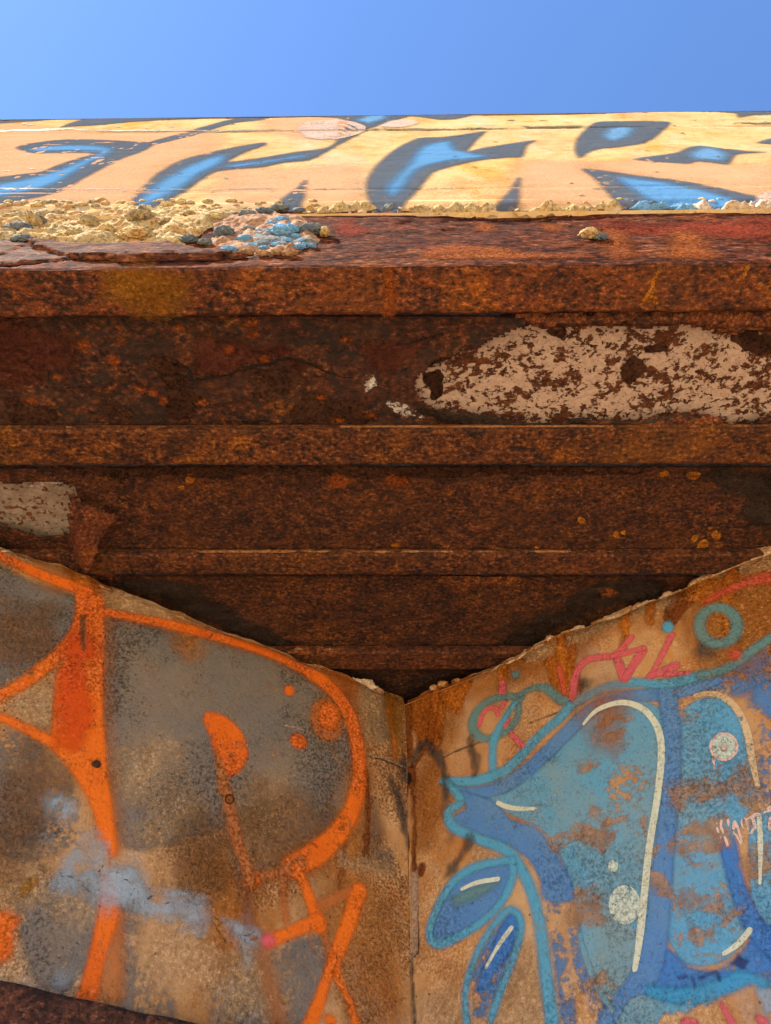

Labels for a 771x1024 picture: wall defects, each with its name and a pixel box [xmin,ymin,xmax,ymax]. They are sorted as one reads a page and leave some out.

peeling [0,238,275,266]
rust [421,245,592,259]
rust [593,217,771,259]
rust [515,270,771,335]
spalling [414,312,771,427]
spalling [0,482,77,537]
rust [66,493,120,610]
spalling [76,574,225,635]
spalling [480,546,771,675]
rust [645,554,771,661]
spalling [353,677,379,691]
rust [384,622,605,876]